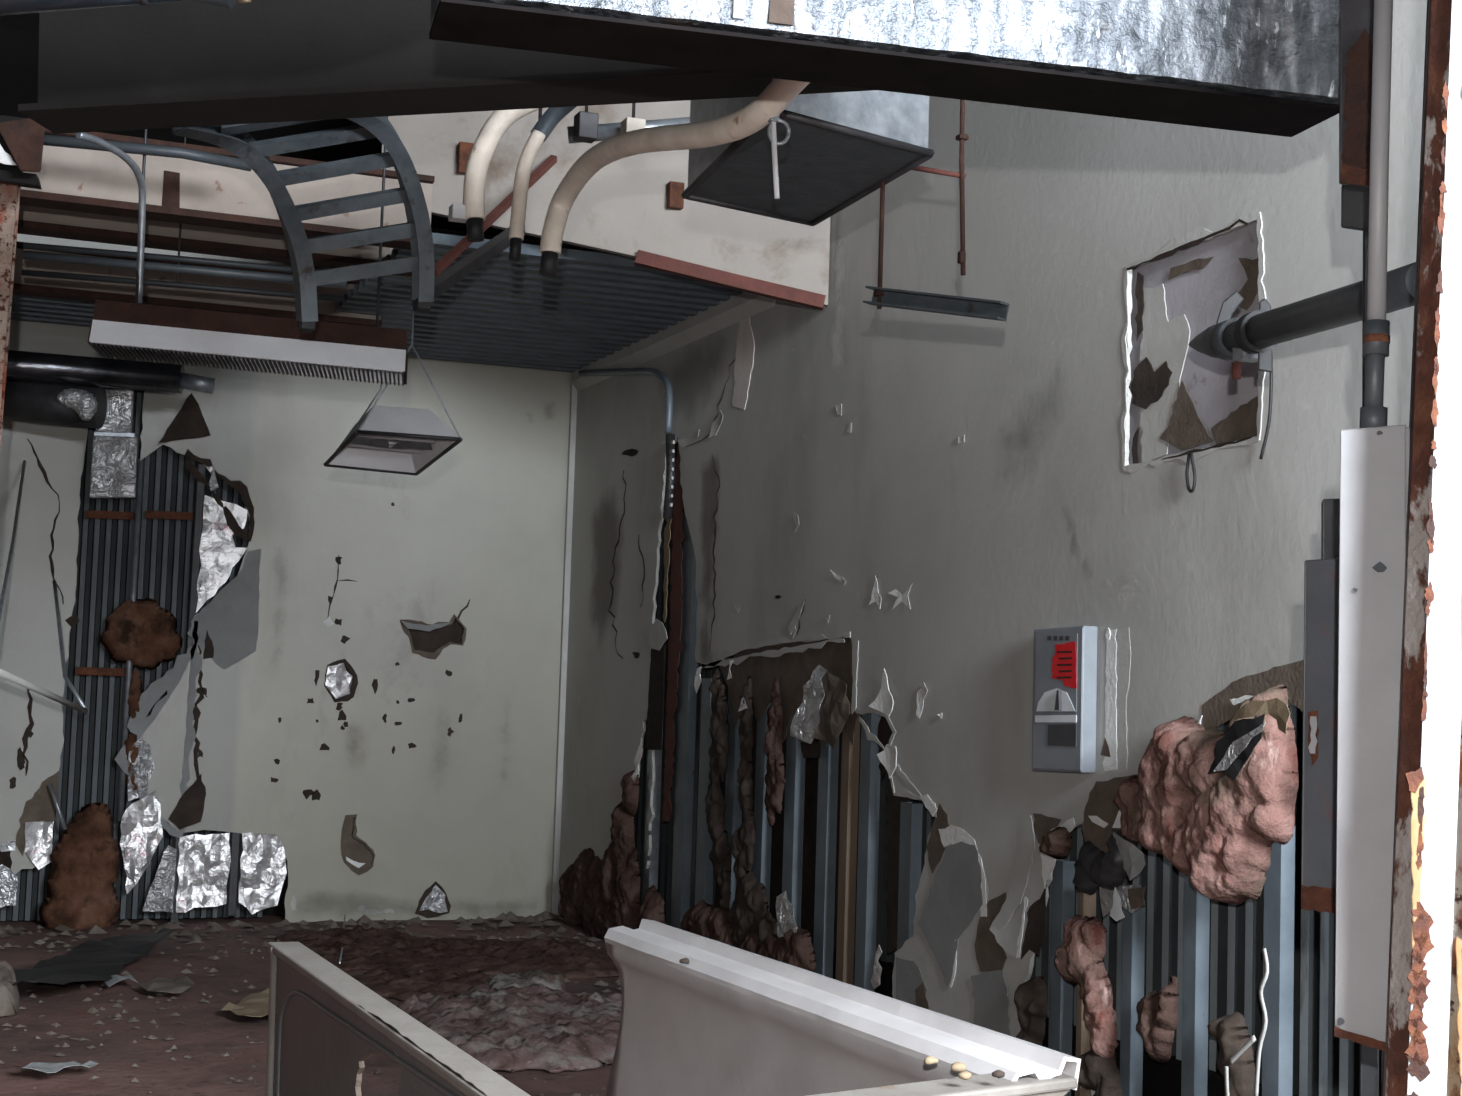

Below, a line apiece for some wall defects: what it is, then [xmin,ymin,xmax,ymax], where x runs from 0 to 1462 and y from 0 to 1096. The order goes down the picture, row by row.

peeling [0,144,16,165]
peeling [0,182,21,452]
peeling [1429,269,1443,469]
peeling [9,731,59,856]
crack [27,439,64,604]
spalling [115,449,261,795]
spalling [307,596,378,730]
spalling [395,599,470,676]
spalling [696,601,937,818]
rust [1334,0,1452,1096]
peeling [1416,786,1425,869]
peeling [1404,902,1435,1096]